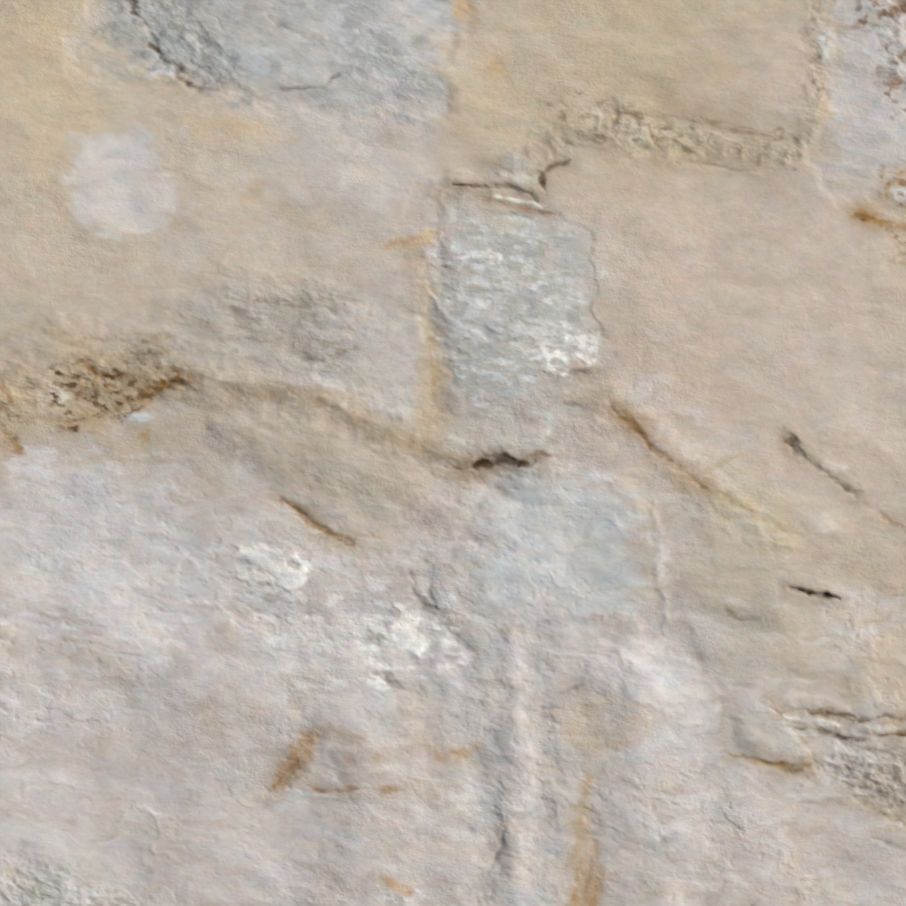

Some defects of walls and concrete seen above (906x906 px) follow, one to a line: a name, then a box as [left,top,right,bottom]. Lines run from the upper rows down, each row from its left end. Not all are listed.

crack [436,98,601,217]
peeling [57,0,622,445]
rust [0,317,207,468]
crack [442,448,558,486]
crack [780,429,906,537]
crack [712,684,906,779]
rust [539,686,658,906]